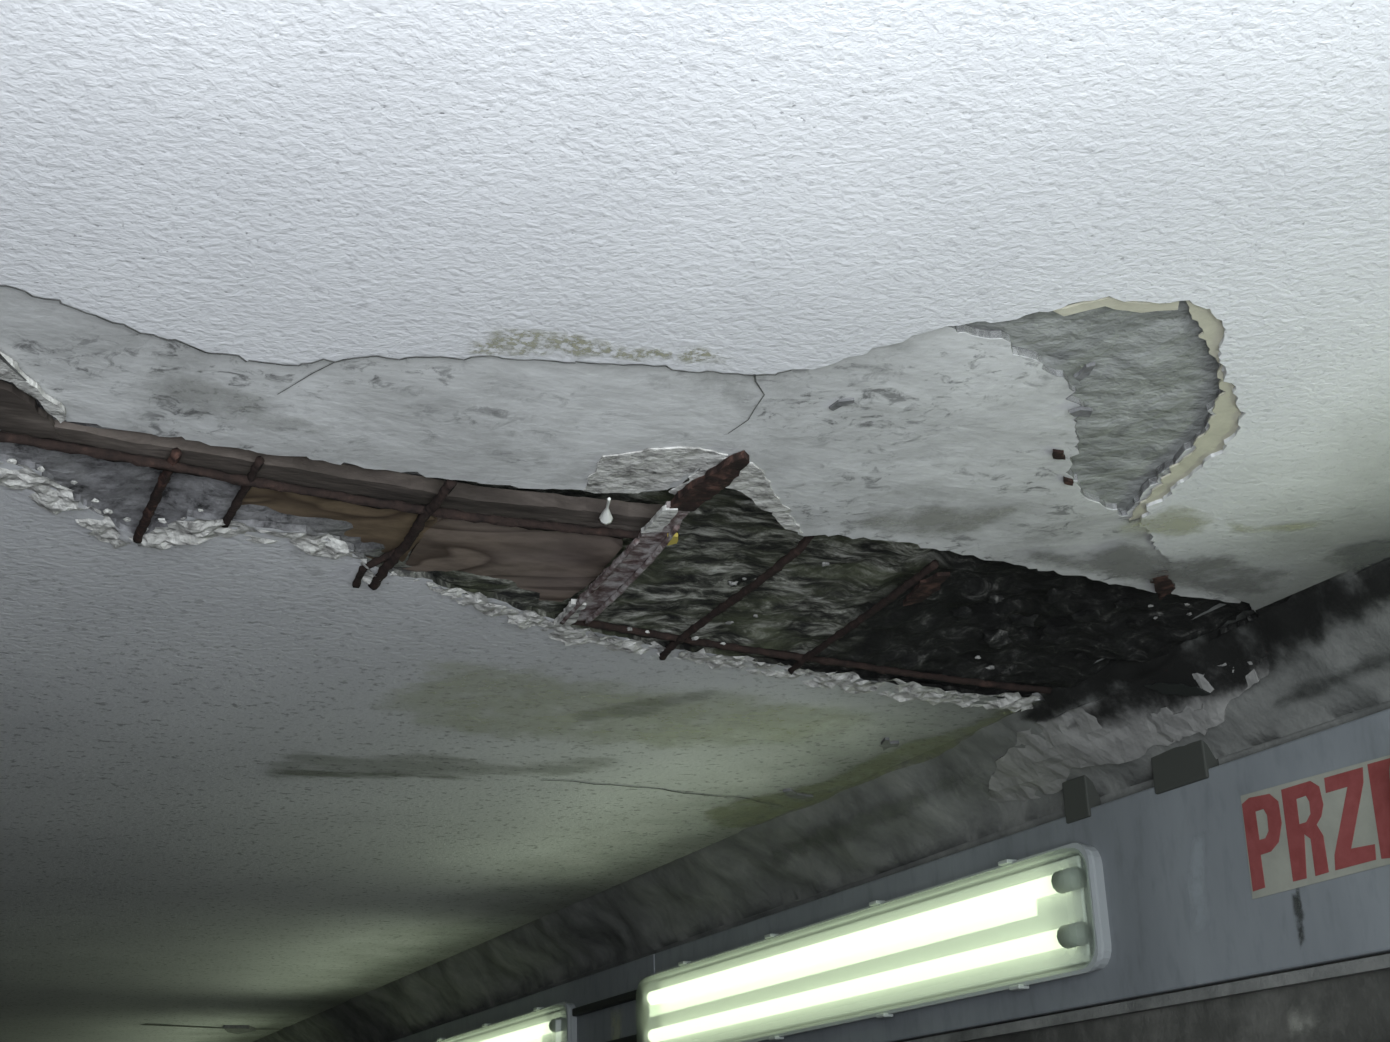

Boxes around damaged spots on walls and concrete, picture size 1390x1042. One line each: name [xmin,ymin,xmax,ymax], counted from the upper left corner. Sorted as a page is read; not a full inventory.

crack [0,285,791,434]
rust [1052,449,1074,486]
peeling [0,285,1289,802]
damp [1035,546,1271,593]
damp [1023,642,1180,721]